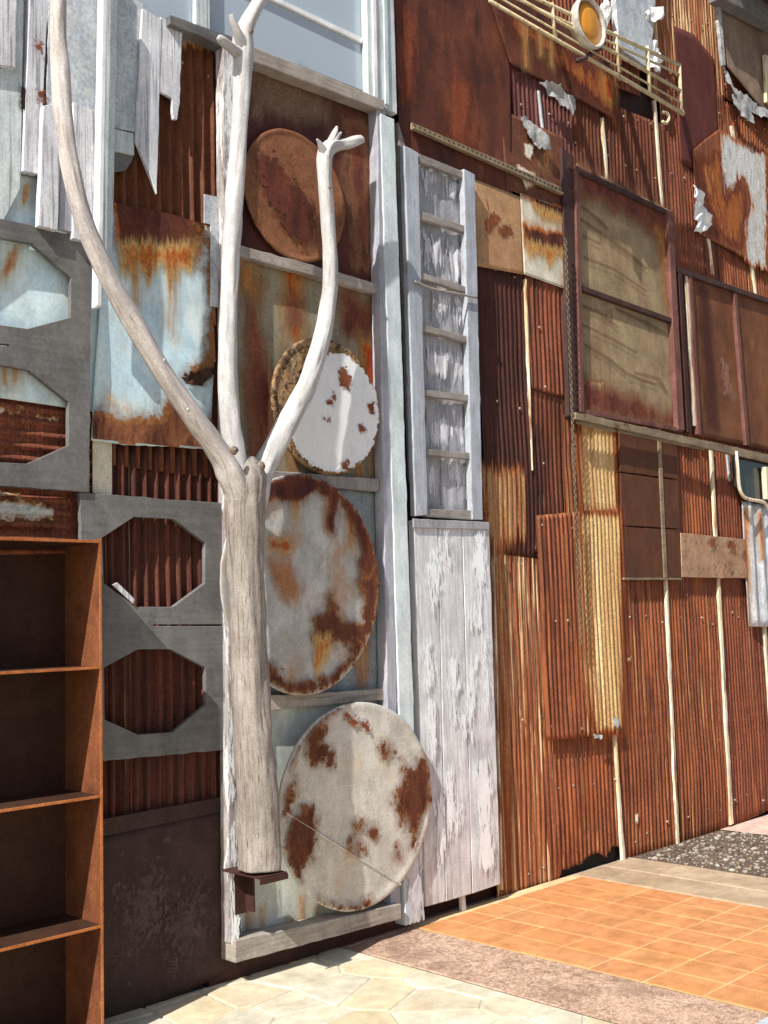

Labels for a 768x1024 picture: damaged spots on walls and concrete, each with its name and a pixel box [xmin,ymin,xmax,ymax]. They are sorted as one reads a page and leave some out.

corrosion [511,14,617,122]
corrosion [485,193,563,268]
corrosion [698,150,745,249]
corrosion [113,202,216,379]
corrosion [336,287,373,383]
corrosion [323,366,352,423]
corrosion [584,375,674,429]
corrosion [268,454,380,695]
corrosion [291,708,370,769]
corrosion [283,782,319,879]
corrosion [347,818,379,856]
corrosion [377,740,432,861]